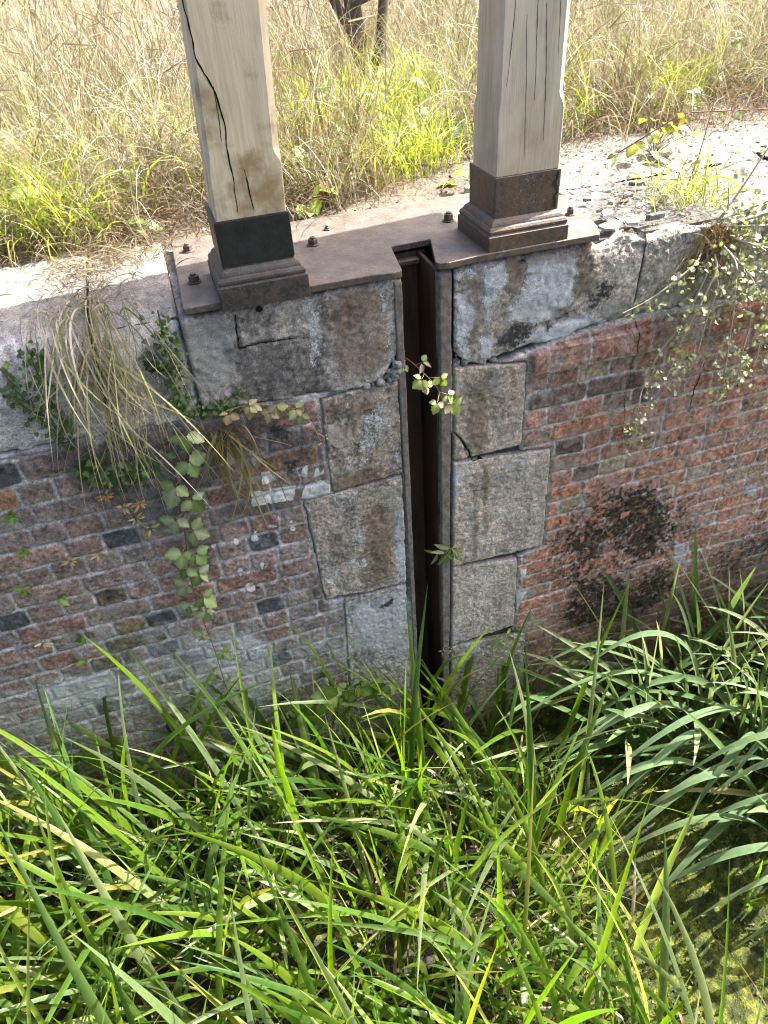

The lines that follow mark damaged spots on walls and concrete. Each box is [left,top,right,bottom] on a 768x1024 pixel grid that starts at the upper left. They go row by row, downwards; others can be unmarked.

crack [182,0,254,212]